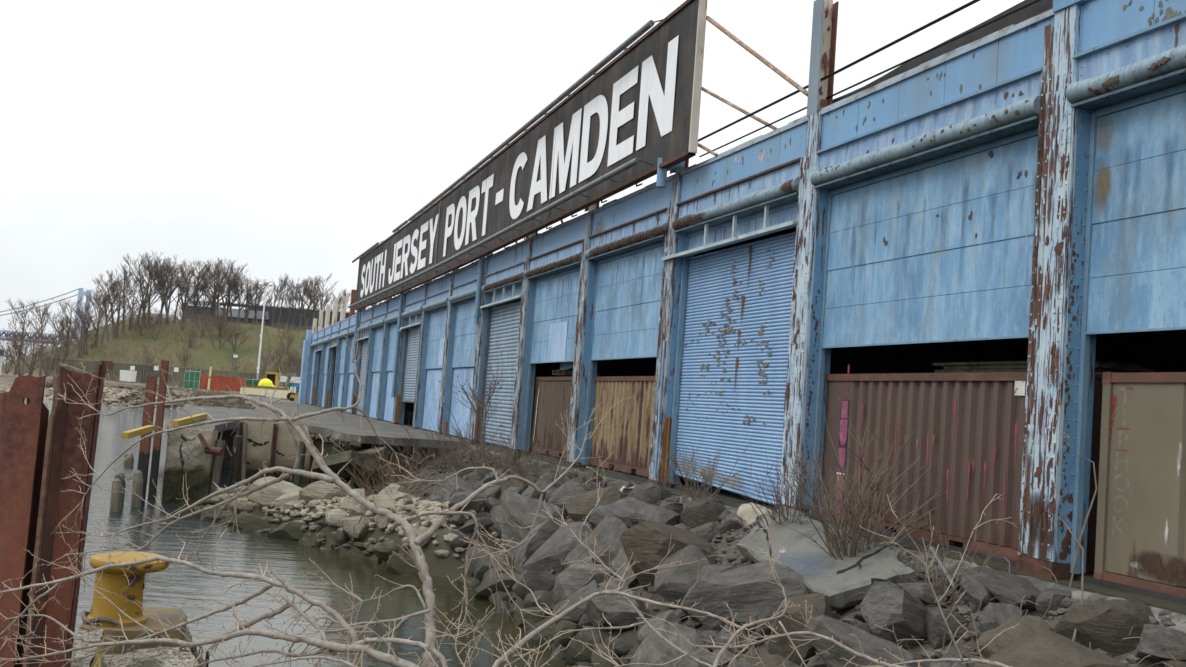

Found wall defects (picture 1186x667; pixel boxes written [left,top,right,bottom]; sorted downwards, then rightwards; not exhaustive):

peeling [912,90,1028,148]
peeling [656,200,676,252]
peeling [654,307,669,394]
peeling [684,261,771,425]
corrosion [735,295,745,384]
peeling [781,156,839,498]
peeling [1020,75,1085,535]
corrosion [1137,553,1186,584]